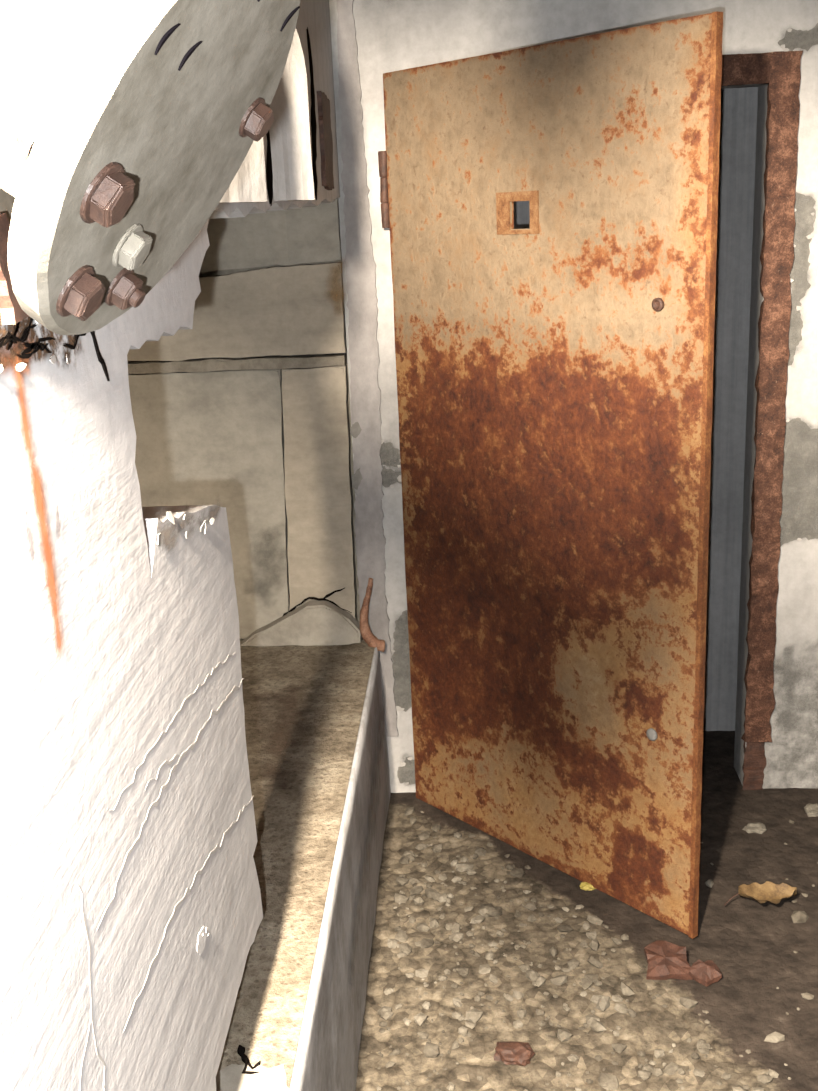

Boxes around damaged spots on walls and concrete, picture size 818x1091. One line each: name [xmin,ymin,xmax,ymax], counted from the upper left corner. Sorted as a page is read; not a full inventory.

spalling [0,190,15,224]
crack [6,323,20,350]
peeling [0,314,86,373]
crack [90,331,110,381]
corrosion [0,336,62,652]
spalling [157,504,220,550]
crack [282,588,352,617]
leakage [765,659,818,789]